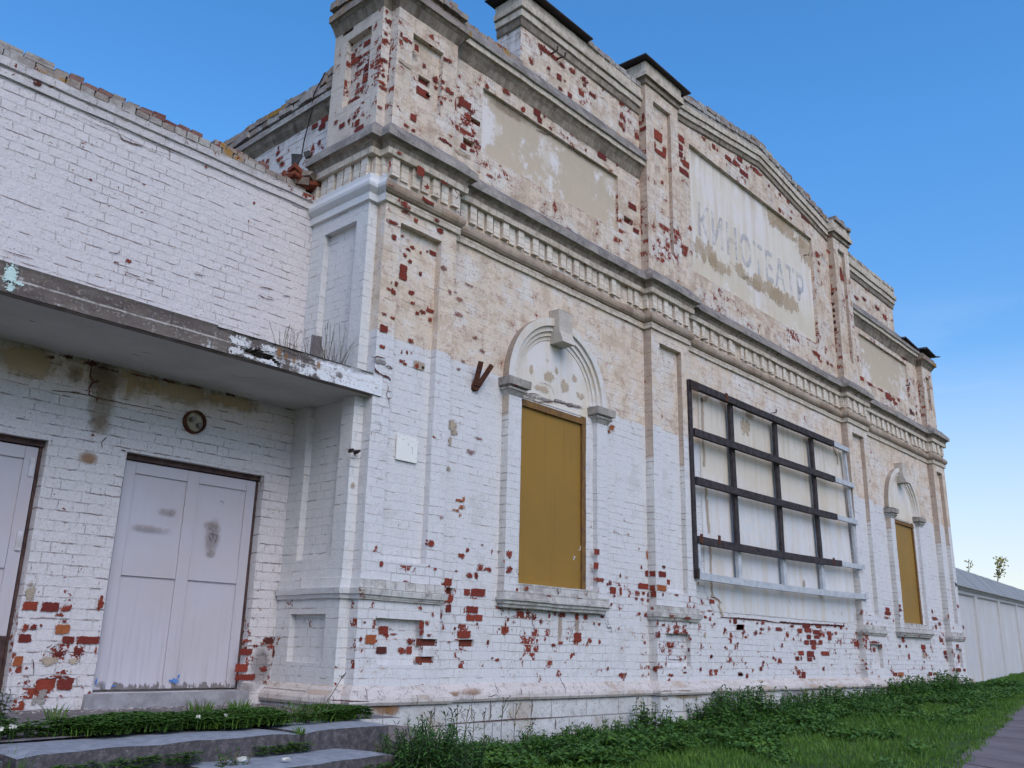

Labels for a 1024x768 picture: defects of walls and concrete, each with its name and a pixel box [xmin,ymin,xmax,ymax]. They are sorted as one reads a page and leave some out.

peeling [309,9,479,159]
peeling [702,137,809,224]
peeling [2,261,24,292]
spalling [228,334,278,365]
water stain [72,359,256,431]
peeling [31,678,74,706]
peeling [18,583,100,666]
peeling [235,636,275,681]
peeling [359,543,513,663]
peeling [551,548,622,648]
spalling [635,546,845,678]
peeling [931,604,966,672]